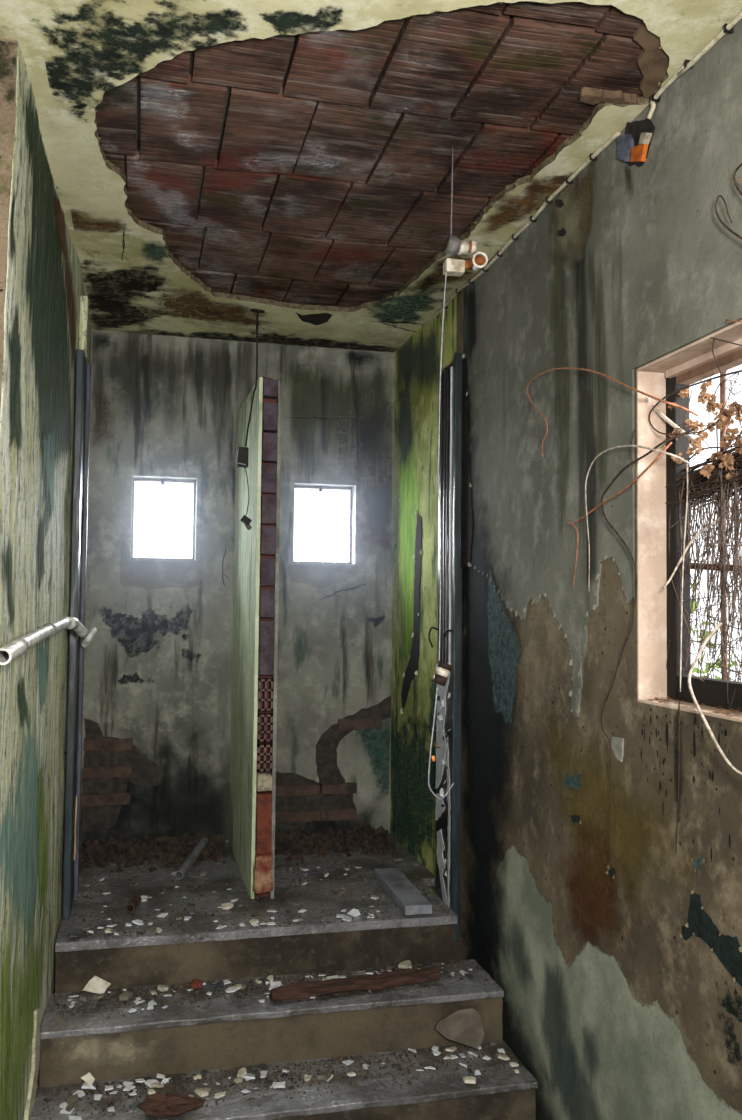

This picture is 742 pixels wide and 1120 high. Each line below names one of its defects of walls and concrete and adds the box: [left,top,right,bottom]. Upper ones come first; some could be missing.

leakage [42,0,247,122]
leakage [260,6,343,35]
leakage [417,255,476,351]
leakage [8,308,21,451]
leakage [54,190,411,551]
leakage [2,542,14,625]
flaking render [275,510,423,823]
flaking render [81,718,163,834]
leakage [461,512,742,1120]
peeling [612,737,624,762]
flaking render [679,891,742,986]